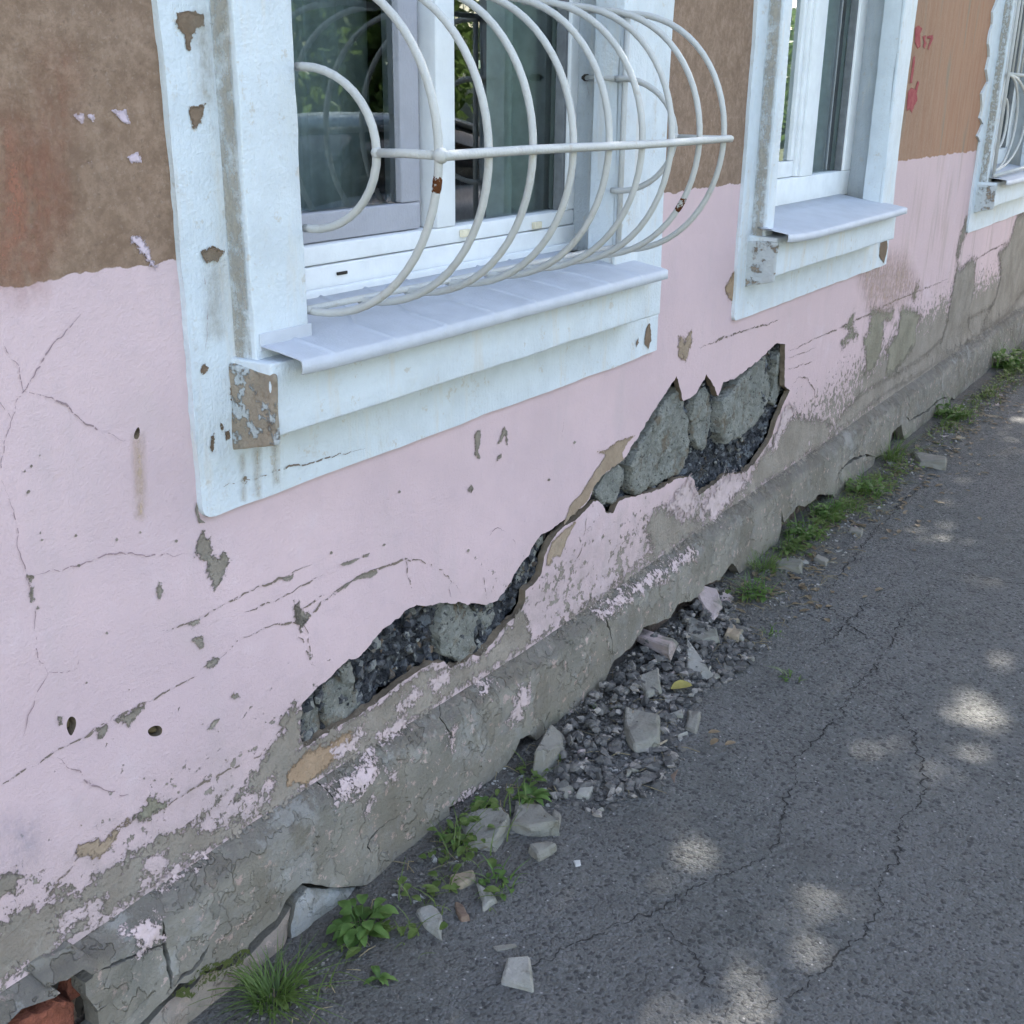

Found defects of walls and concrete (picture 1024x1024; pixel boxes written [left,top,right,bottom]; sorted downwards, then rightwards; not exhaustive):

rust [432,176,442,194]
crack [705,319,779,346]
crack [219,448,365,489]
crack [0,314,178,736]
peeling [0,213,1024,993]
crack [3,558,458,796]
crack [143,726,285,819]
crack [0,857,79,943]